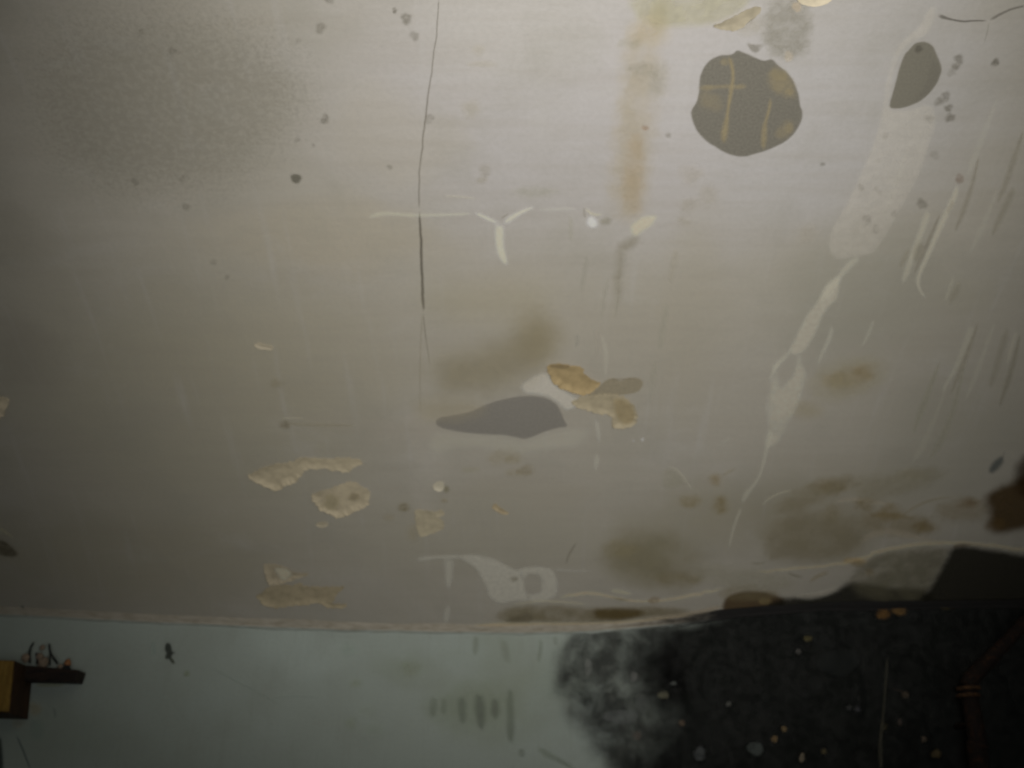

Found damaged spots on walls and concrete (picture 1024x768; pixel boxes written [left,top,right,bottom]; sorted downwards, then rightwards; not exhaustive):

peeling [714,6,761,32]
flaking render [692,51,802,156]
flaking render [890,42,941,108]
crack [417,215,425,307]
flaking render [437,363,642,438]
peeling [248,457,370,528]